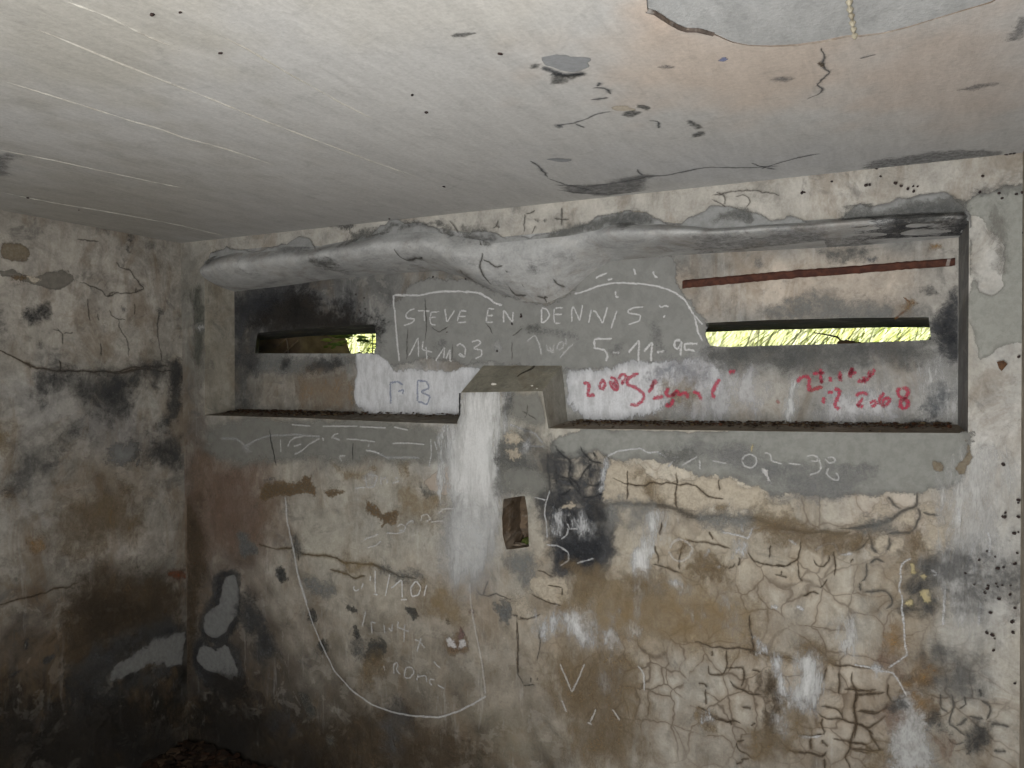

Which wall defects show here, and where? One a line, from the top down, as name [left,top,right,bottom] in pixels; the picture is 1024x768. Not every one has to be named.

spalling [532,54,591,84]
crack [810,49,830,98]
spalling [646,0,995,47]
flaking render [0,243,74,290]
crack [0,263,173,374]
crack [479,154,815,302]
water stain [37,359,183,471]
crack [259,534,423,583]
water stain [404,392,1021,768]
crack [603,495,938,609]
crack [696,616,898,768]
crack [932,689,1008,755]